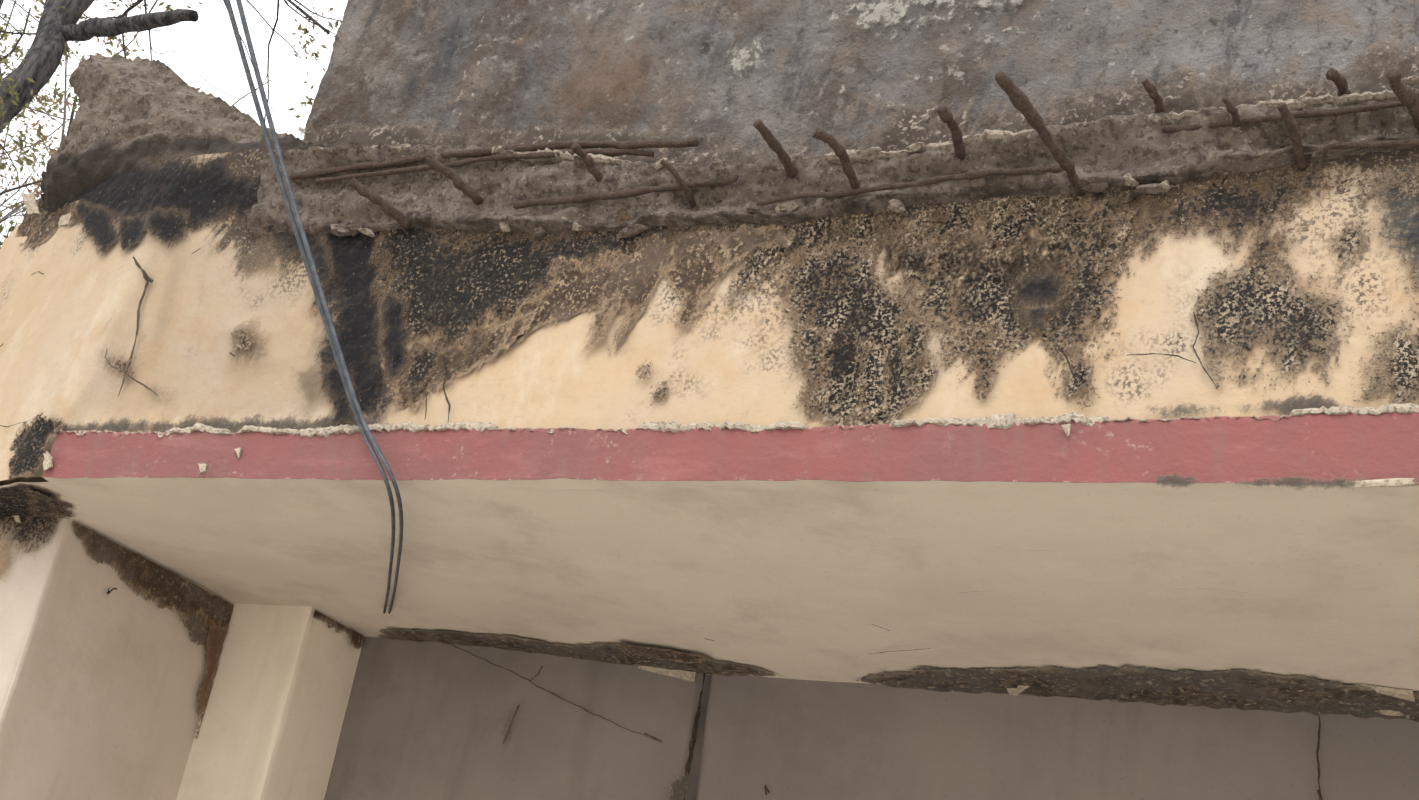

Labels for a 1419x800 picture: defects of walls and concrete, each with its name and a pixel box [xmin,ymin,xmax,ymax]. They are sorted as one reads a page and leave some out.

crack [105,256,158,396]
water stain [18,149,1419,433]
spalling [247,41,1419,413]
spalling [856,665,1419,722]
crack [1315,713,1323,800]